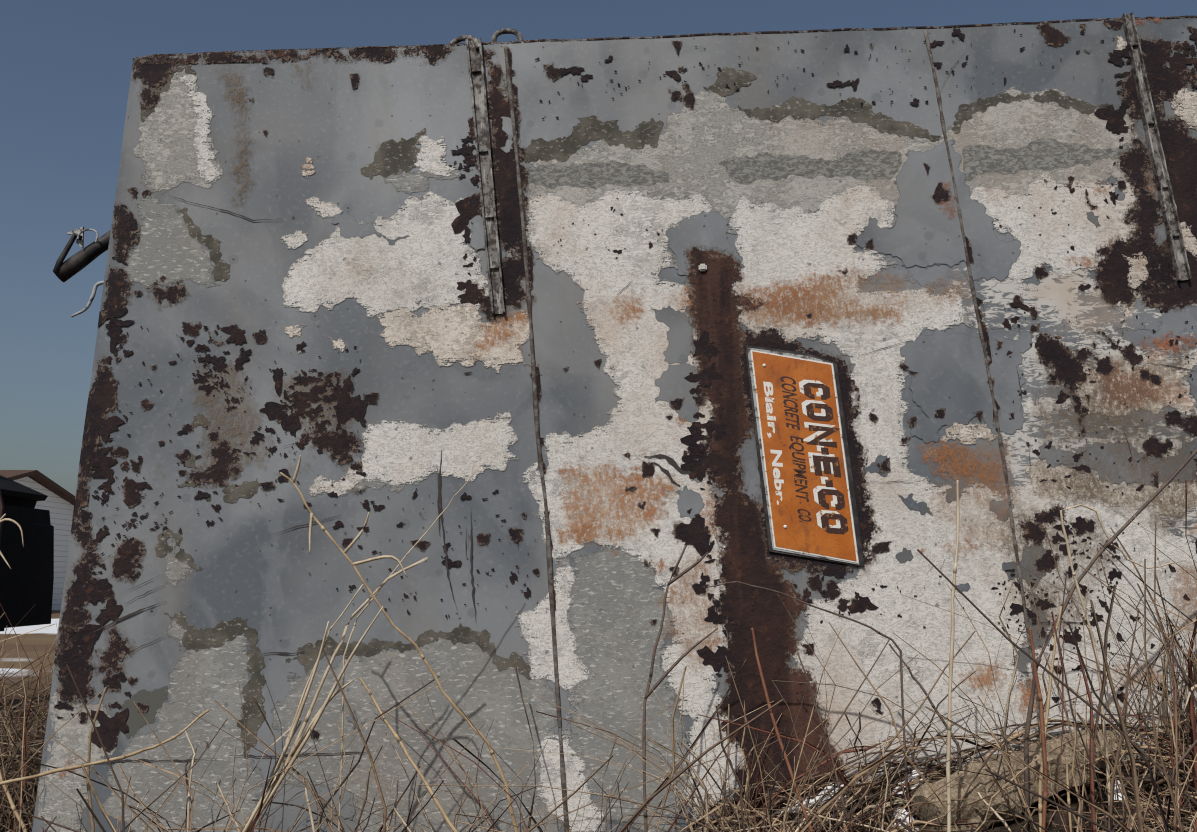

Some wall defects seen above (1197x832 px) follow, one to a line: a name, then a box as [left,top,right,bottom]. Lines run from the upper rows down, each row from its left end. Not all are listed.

peeling [123,69,224,288]
rust [463,48,536,349]
rust [847,233,874,249]
rust [1036,23,1069,46]
rust [1082,18,1197,309]
rust [54,334,146,724]
peeling [164,539,193,587]
rust [283,375,379,471]
rust [543,247,900,826]
peeling [270,85,1197,832]
rust [923,294,1197,632]
peeling [37,615,264,832]